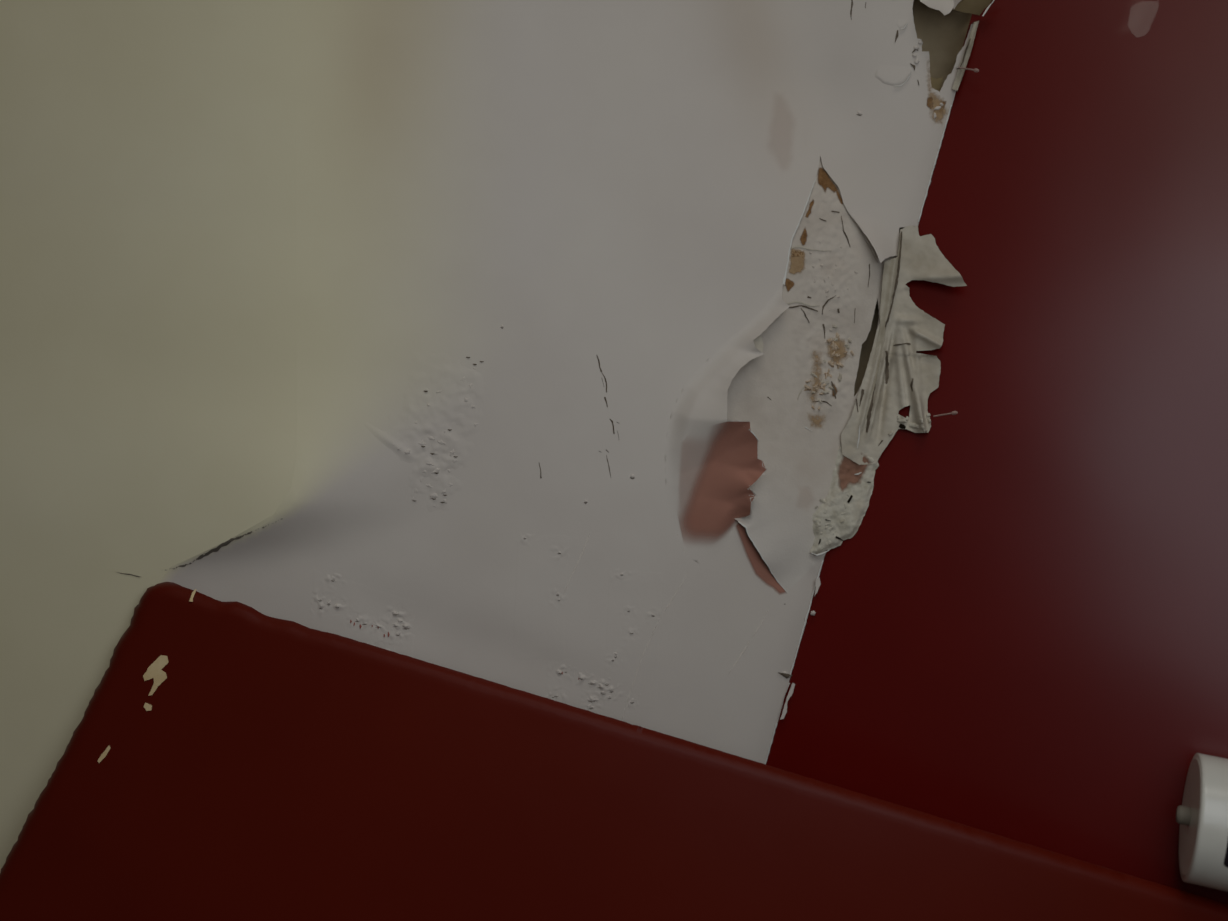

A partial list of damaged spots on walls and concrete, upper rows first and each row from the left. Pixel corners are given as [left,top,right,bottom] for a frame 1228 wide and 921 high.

spalling [910,0,994,122]
peeling [664,158,900,596]
peeling [143,655,169,711]
spalling [780,683,795,720]